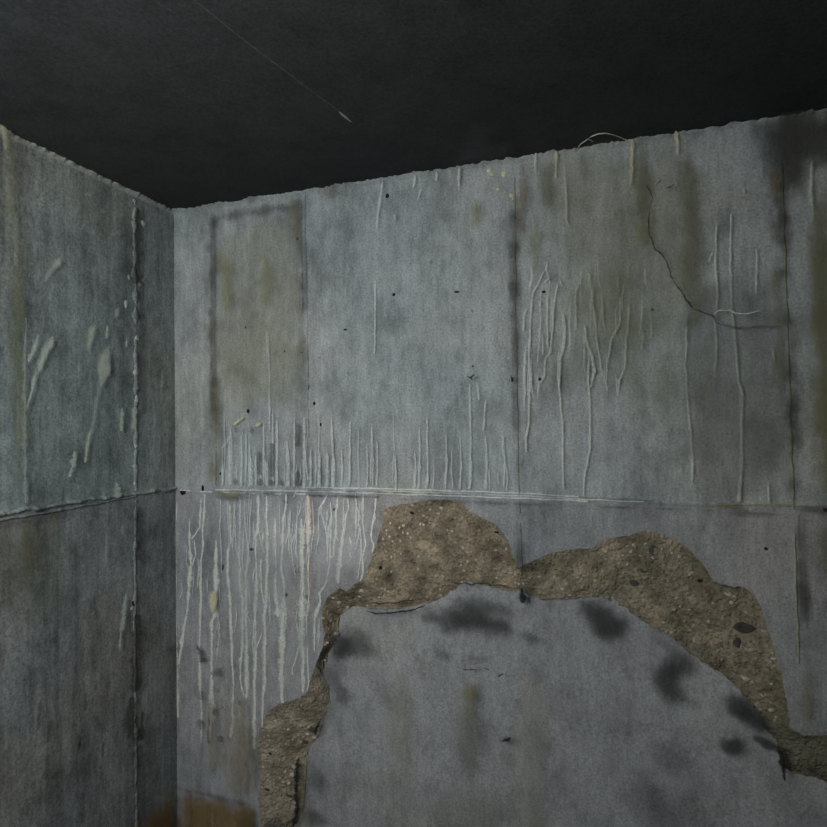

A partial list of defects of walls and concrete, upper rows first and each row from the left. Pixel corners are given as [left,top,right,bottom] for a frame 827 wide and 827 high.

water stain [764,111,827,221]
crack [646,180,760,325]
water stain [22,333,54,412]
water stain [68,349,110,477]
water stain [119,395,139,431]
water stain [507,272,630,494]
water stain [729,215,743,502]
water stain [176,490,377,786]
spalling [257,499,827,827]
water stain [581,602,623,640]
water stain [653,656,687,700]
water stain [725,696,781,751]